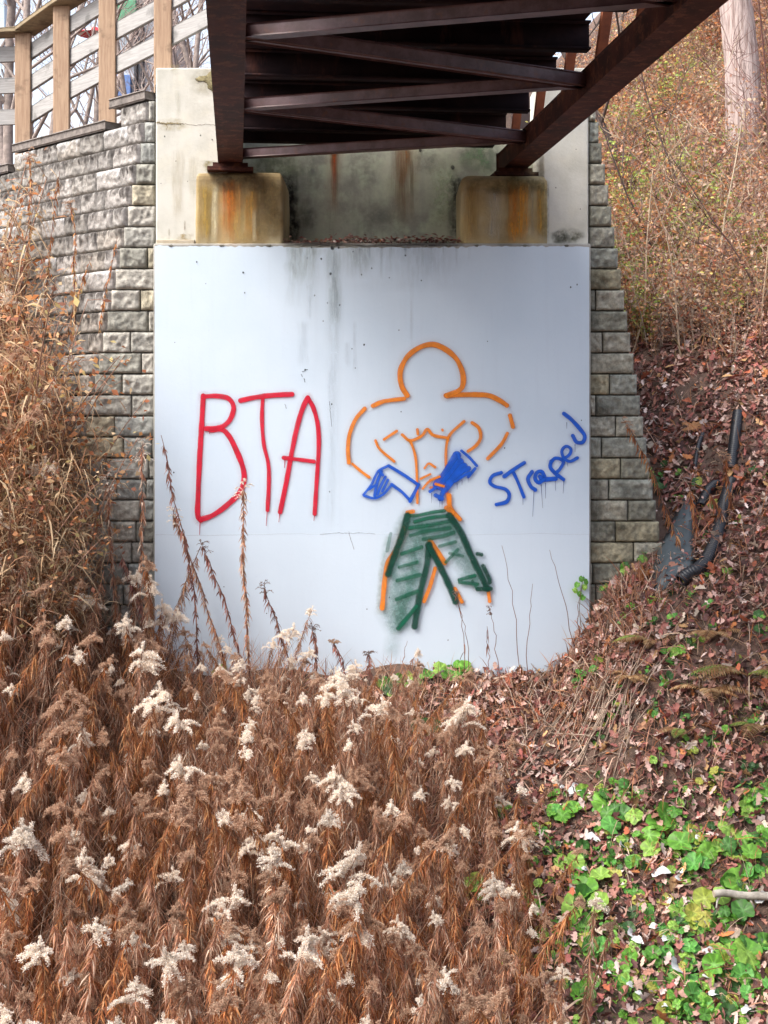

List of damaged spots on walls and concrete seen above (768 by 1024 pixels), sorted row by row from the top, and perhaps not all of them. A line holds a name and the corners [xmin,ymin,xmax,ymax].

rust [201,183,256,237]